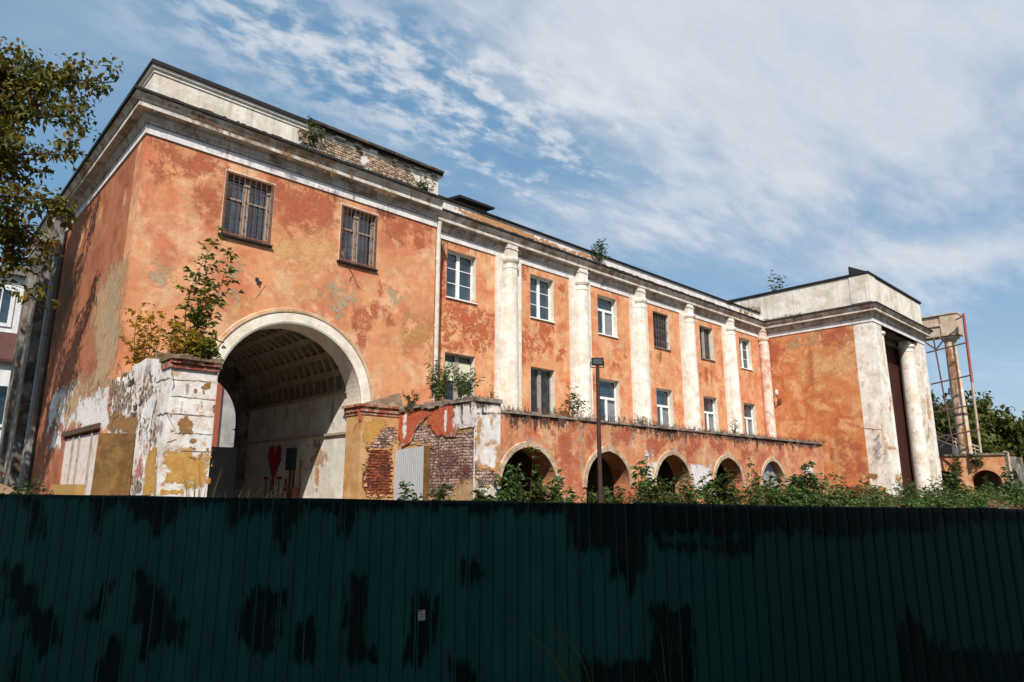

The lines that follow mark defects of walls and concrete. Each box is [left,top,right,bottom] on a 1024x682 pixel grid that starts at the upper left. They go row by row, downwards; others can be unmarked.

spalling [298,118,444,187]
peeling [46,254,213,496]
spalling [362,395,501,500]